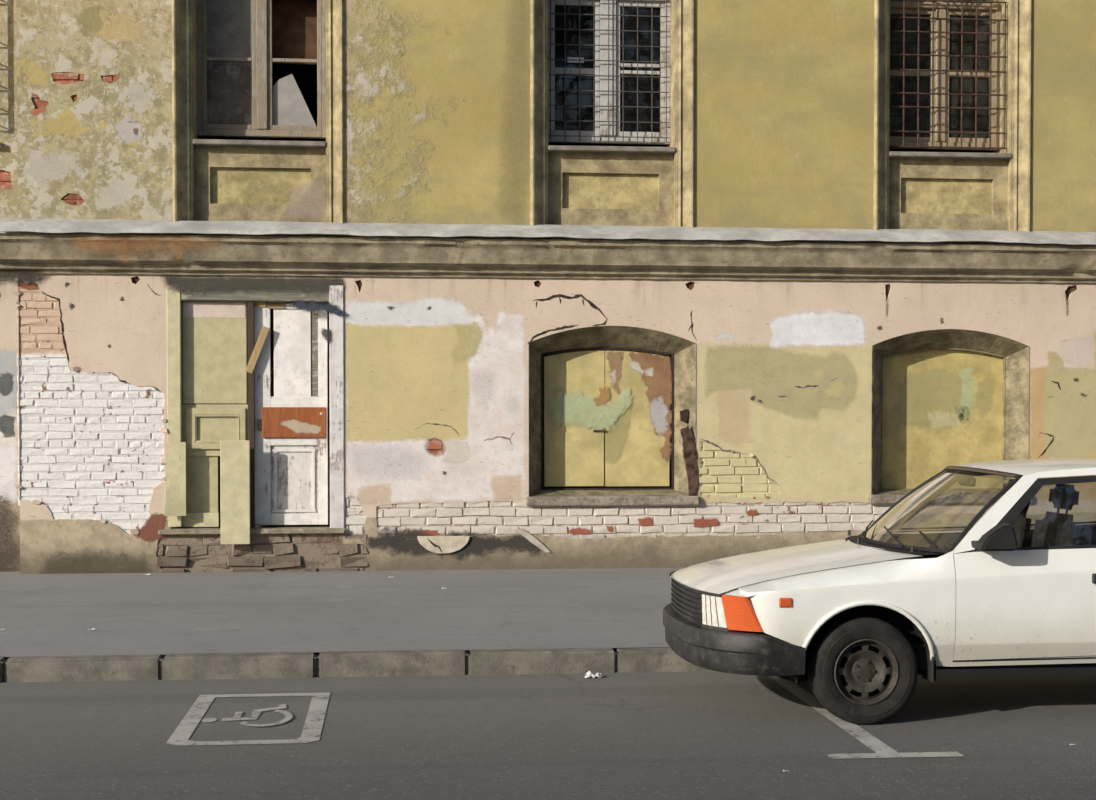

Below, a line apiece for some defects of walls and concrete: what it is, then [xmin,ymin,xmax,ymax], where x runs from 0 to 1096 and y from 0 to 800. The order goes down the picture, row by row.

peeling [0,145,134,213]
crack [527,294,607,344]
flaking render [0,279,893,573]